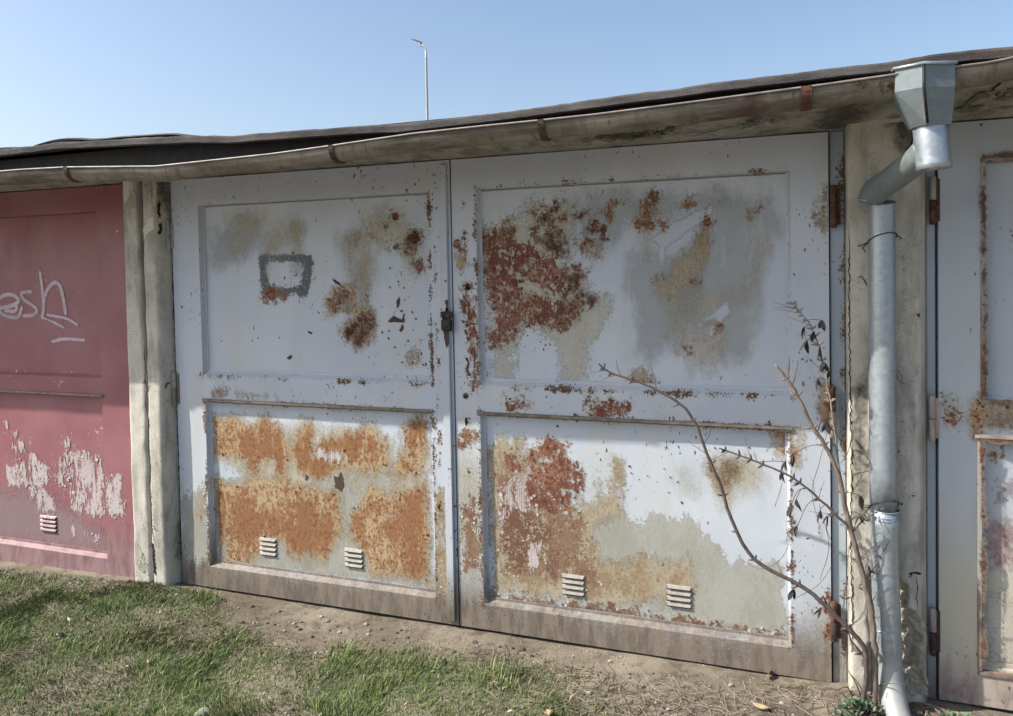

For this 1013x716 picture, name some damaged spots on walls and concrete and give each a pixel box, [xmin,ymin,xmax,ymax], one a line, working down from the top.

rust [326,209,425,353]
rust [441,190,624,392]
rust [632,186,669,240]
rust [649,193,716,303]
rust [979,151,1013,257]
rust [628,367,660,384]
peeling [2,420,126,519]
rust [196,413,447,596]
rust [457,428,697,612]
rust [708,460,759,499]
rust [939,269,1013,663]
spalling [900,577,929,697]